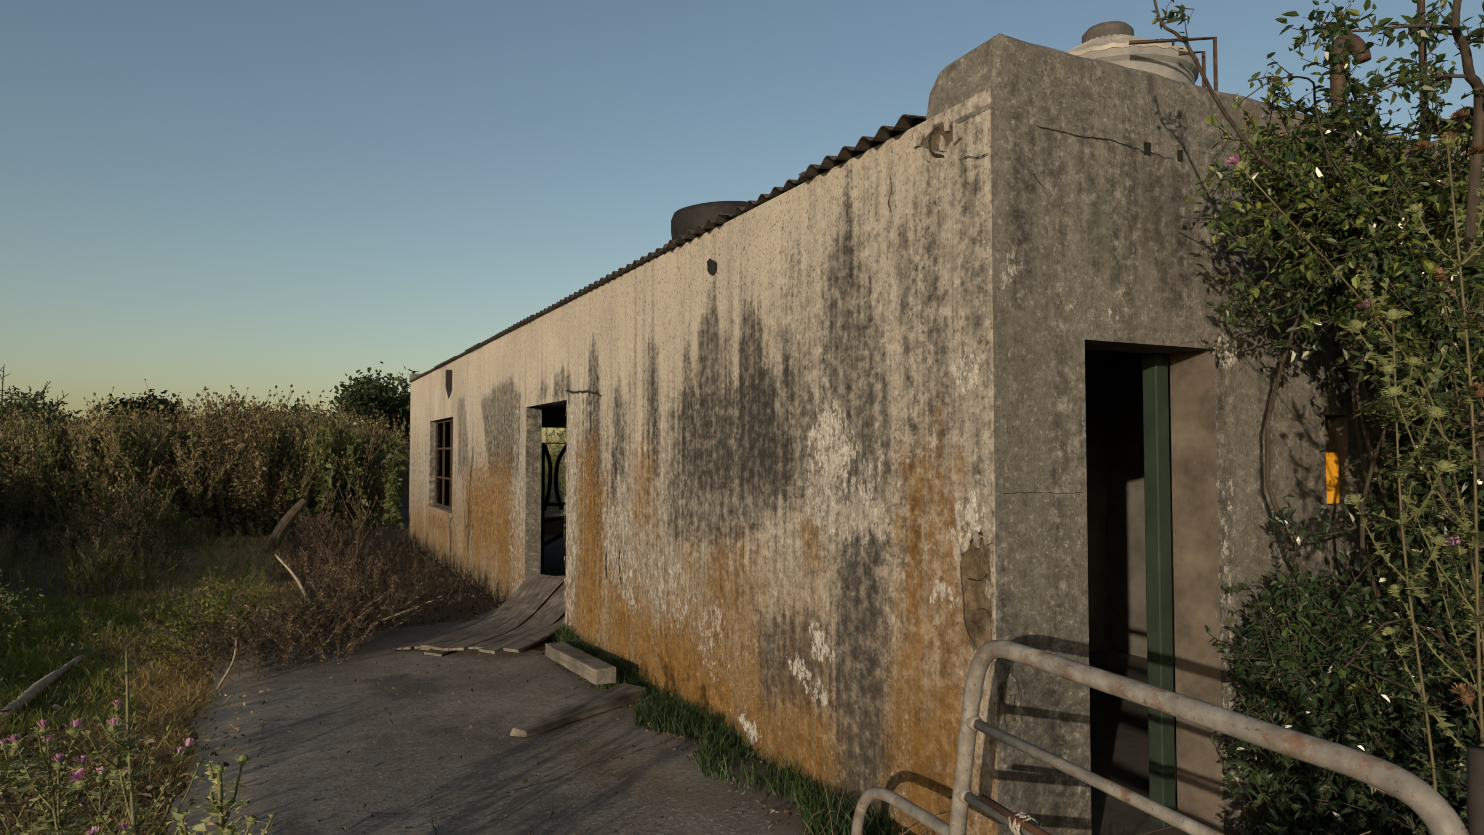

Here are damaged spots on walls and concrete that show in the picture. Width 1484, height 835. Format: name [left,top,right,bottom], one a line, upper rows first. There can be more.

damp [482,382,520,472]
damp [643,238,889,546]
rust [896,415,969,835]
flaking render [925,427,994,655]
flaking render [988,660,1021,731]